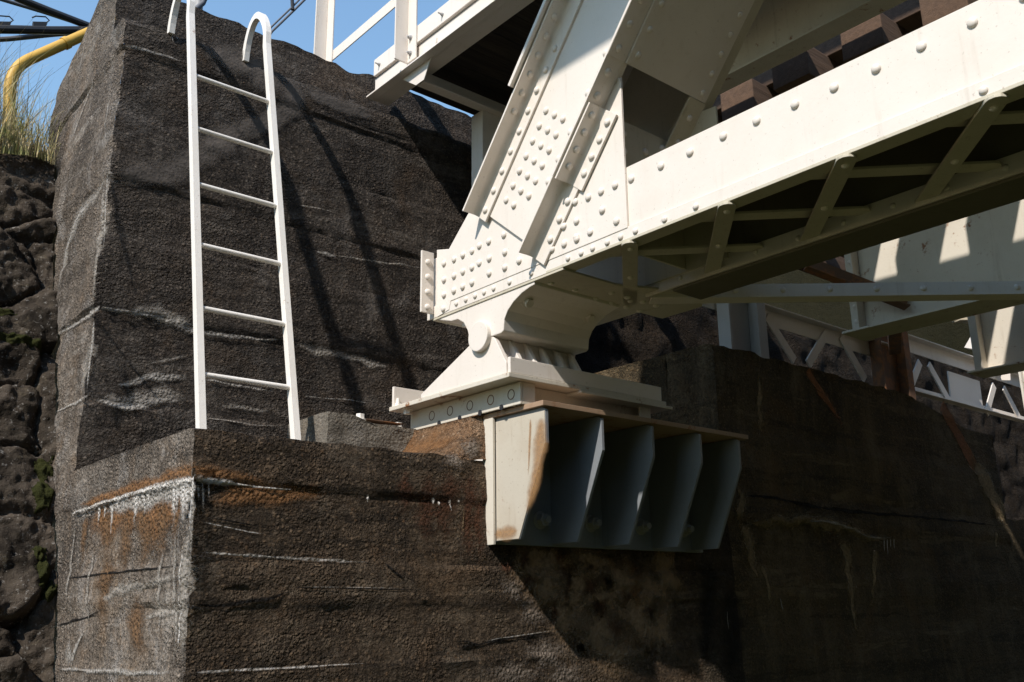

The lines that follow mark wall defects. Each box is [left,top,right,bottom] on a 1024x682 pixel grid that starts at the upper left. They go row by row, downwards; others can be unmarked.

corrosion [82,467,315,562]
leakage [73,475,354,641]
crack [750,495,990,525]